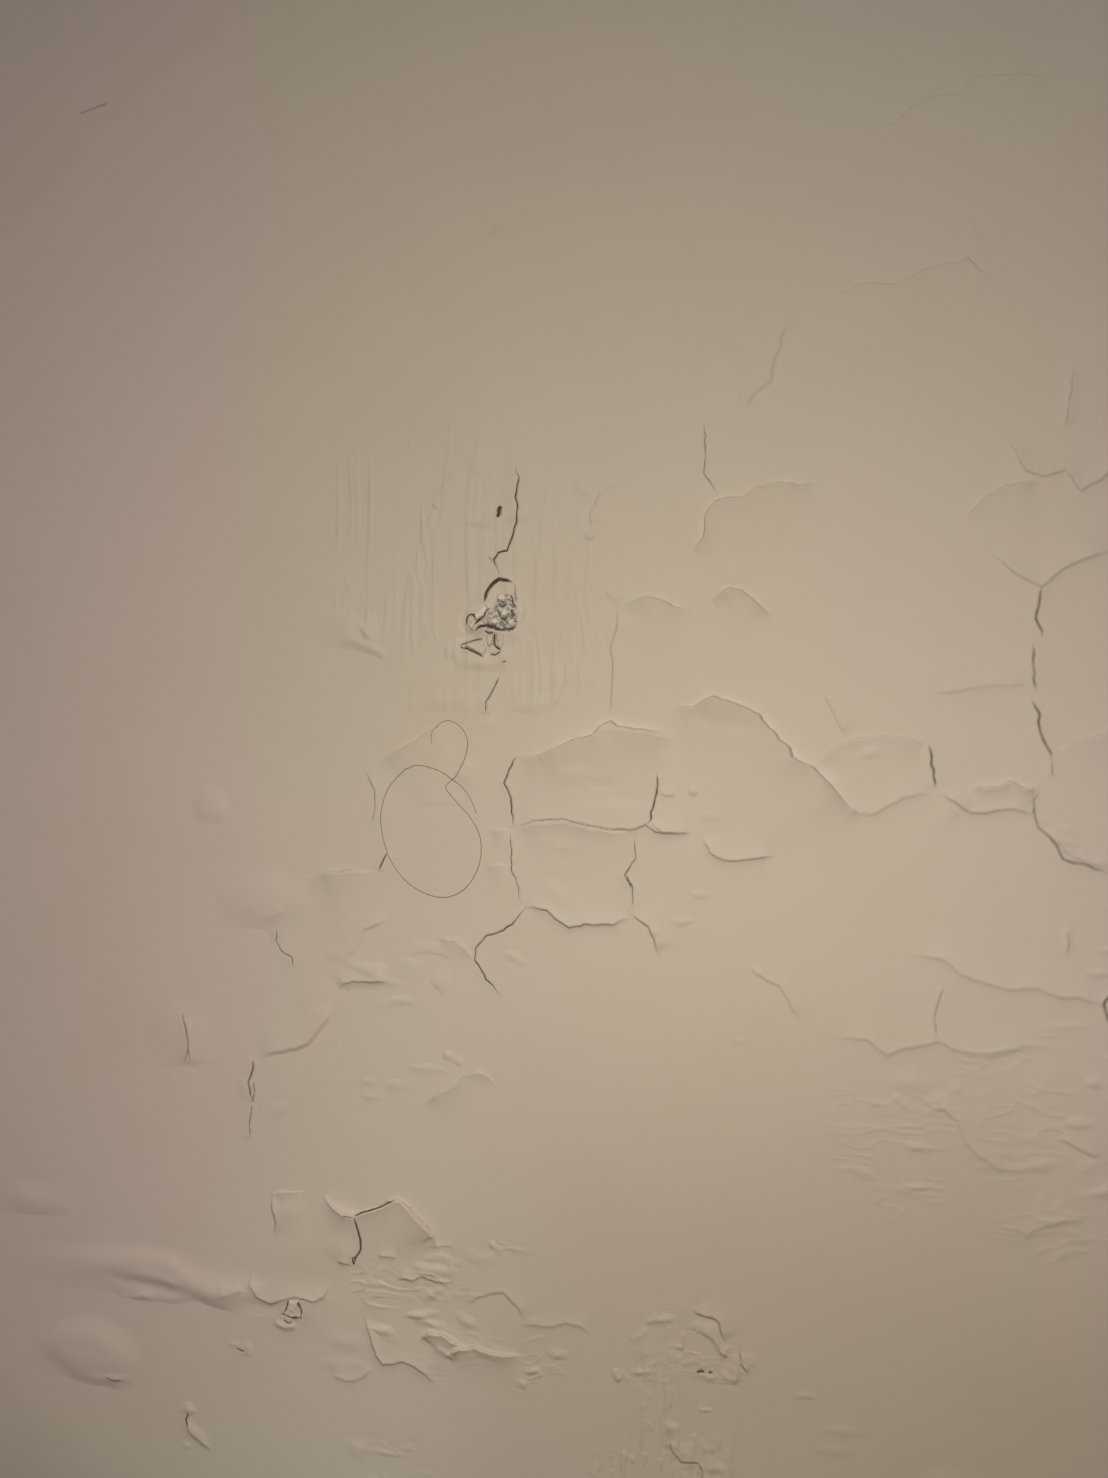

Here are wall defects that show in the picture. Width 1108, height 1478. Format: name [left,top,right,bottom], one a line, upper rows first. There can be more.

crack [479,451,530,579]
crack [472,669,511,723]
crack [1014,588,1071,793]
flaking render [244,1300,334,1344]